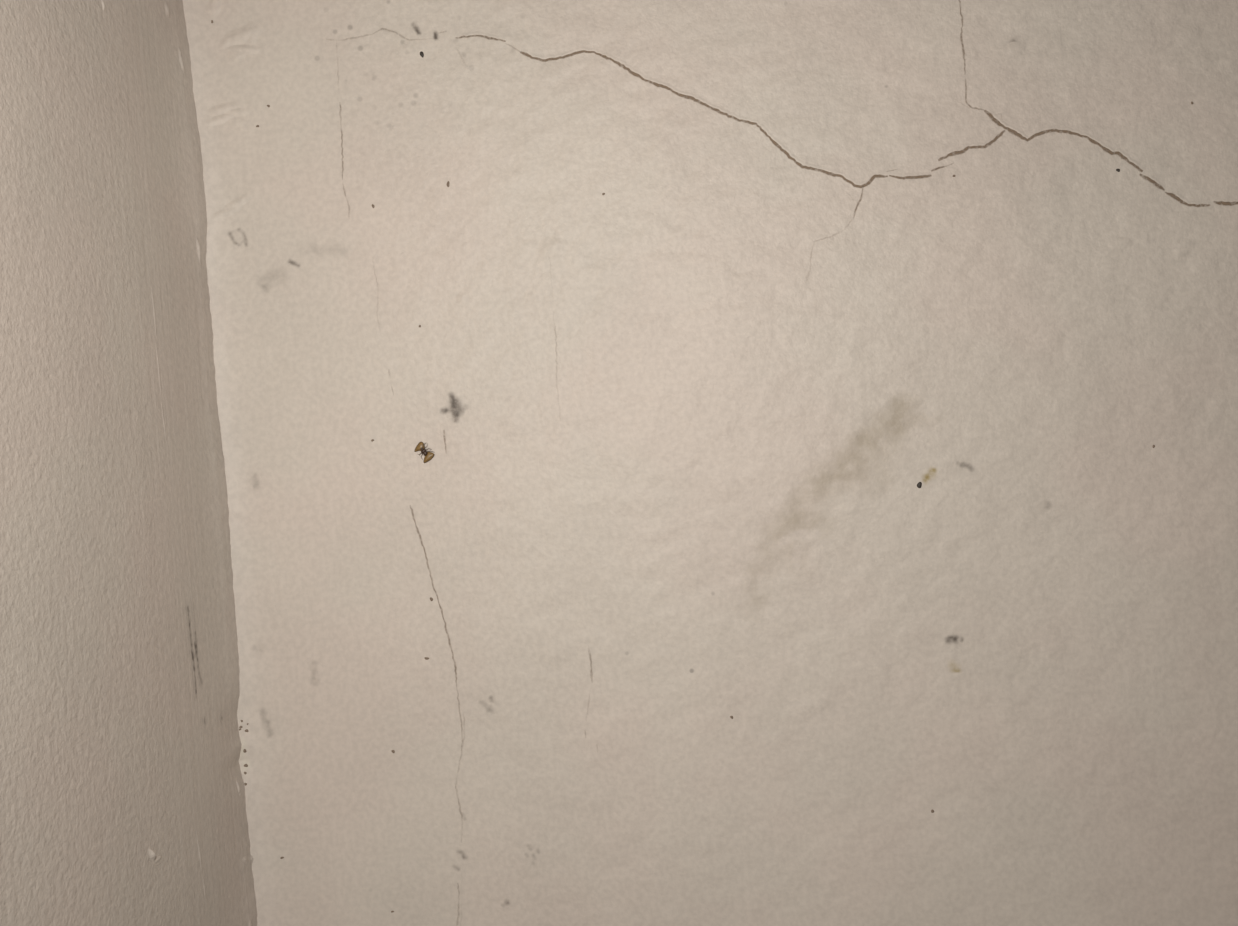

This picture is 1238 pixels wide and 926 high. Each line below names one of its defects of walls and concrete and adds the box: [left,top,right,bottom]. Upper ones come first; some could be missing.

crack [456,32,1238,210]